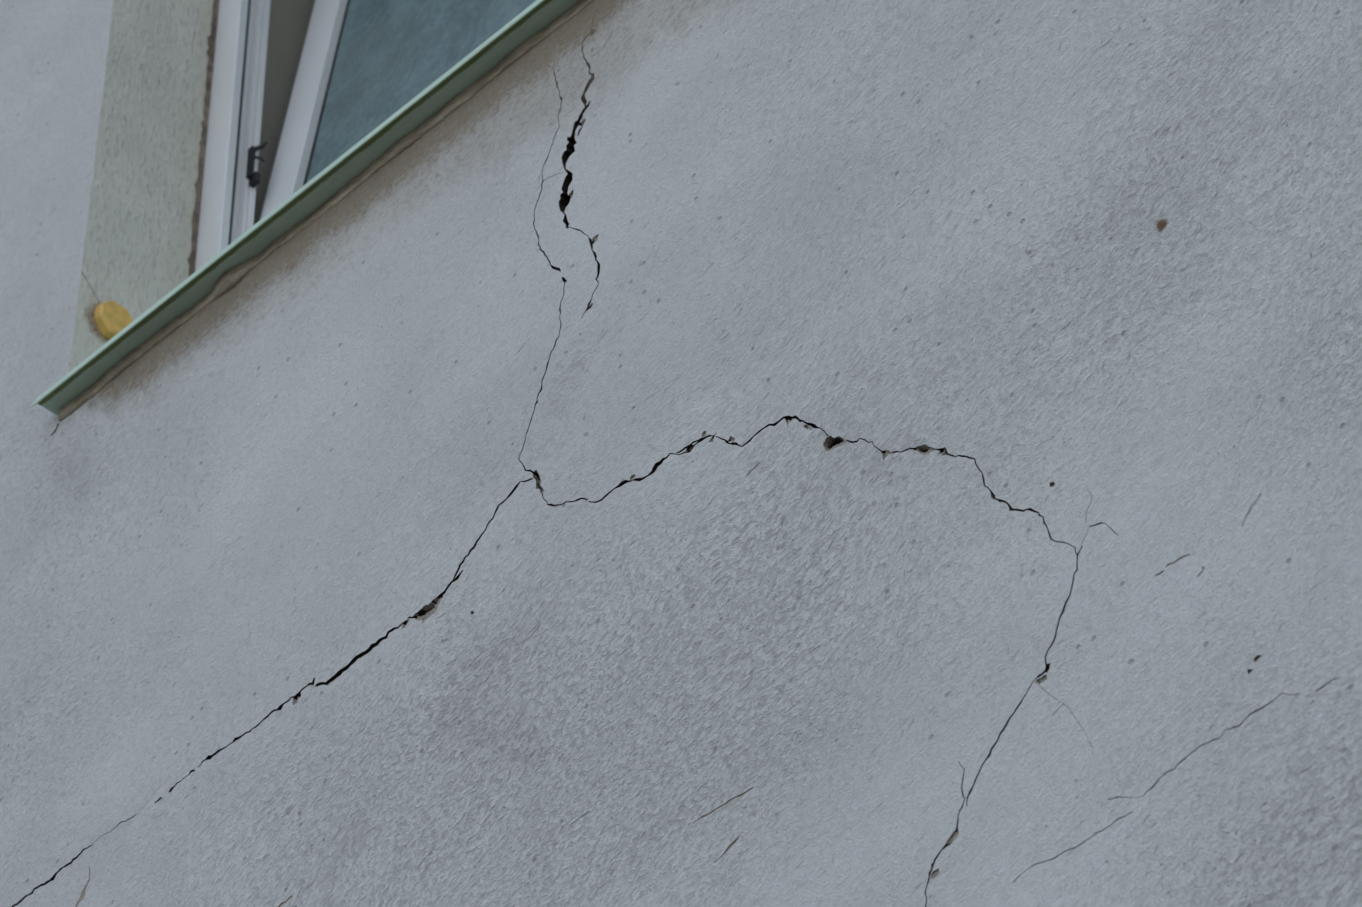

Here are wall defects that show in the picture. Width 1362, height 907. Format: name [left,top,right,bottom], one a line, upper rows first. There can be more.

crack [11,21,1118,907]